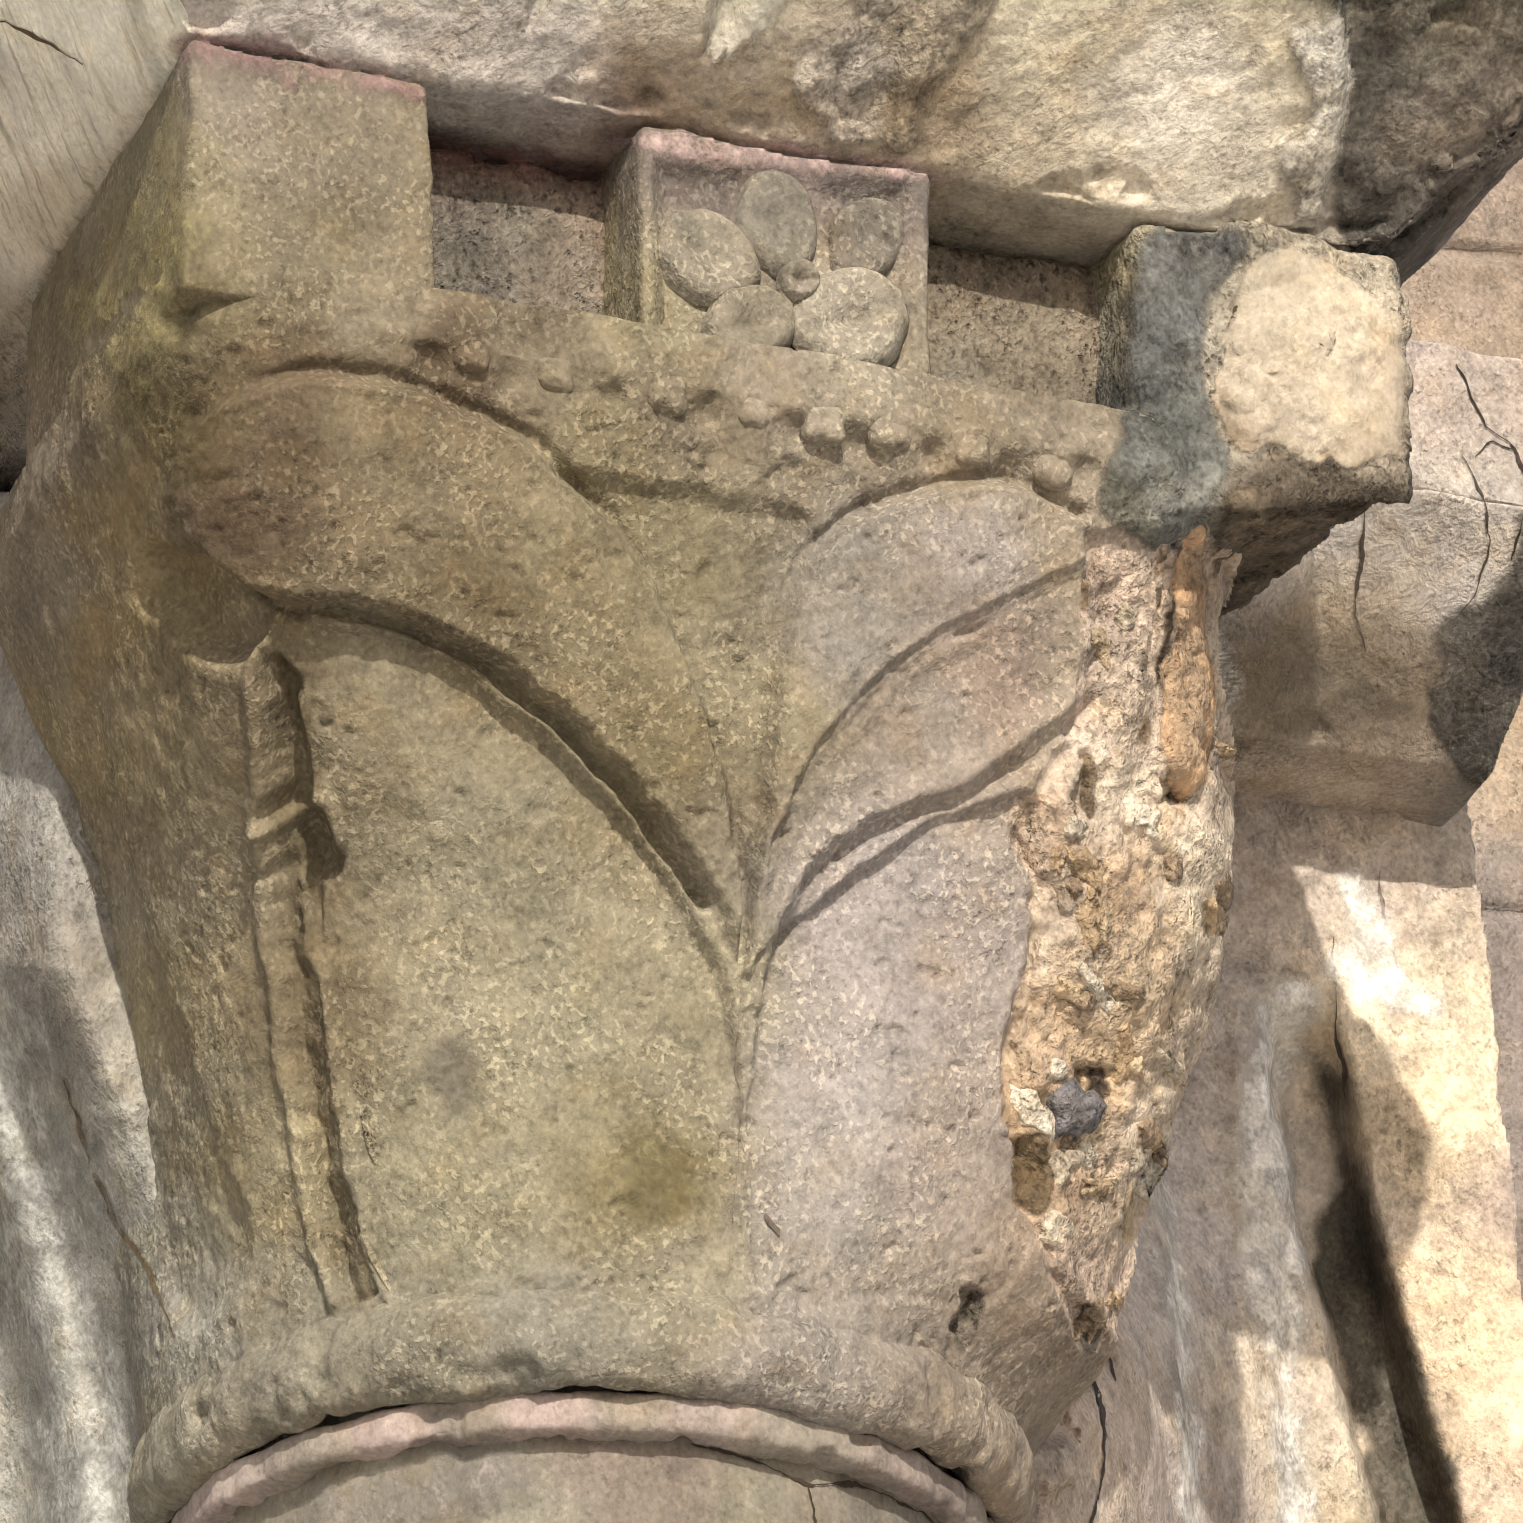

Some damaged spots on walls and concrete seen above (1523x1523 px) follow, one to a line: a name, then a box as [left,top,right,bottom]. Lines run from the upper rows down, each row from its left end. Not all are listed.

crack [0,21,82,65]
damp [1100,226,1248,553]
crack [1456,364,1523,607]
damp [1218,510,1523,788]
spalling [1008,525,1242,1353]
crack [691,1443,934,1523]
spalling [953,1292,984,1346]
crack [1090,1358,1116,1523]